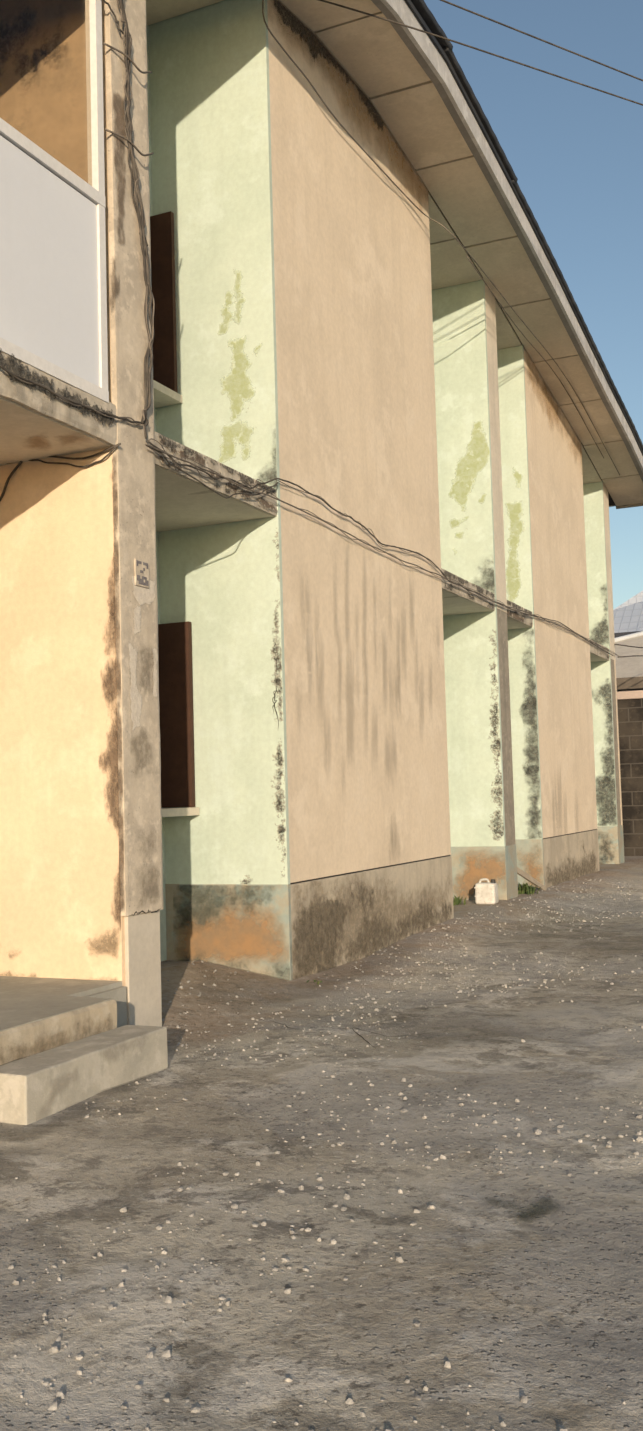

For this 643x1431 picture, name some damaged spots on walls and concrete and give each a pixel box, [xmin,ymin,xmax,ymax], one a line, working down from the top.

water stain [274,0,384,130]
water stain [0,349,118,426]
peeling [158,270,278,513]
peeling [448,421,490,555]
peeling [505,468,526,622]
peeling [270,601,283,722]
water stain [93,543,124,953]
peeling [271,742,286,877]
water stain [521,652,540,838]
water stain [547,684,617,886]
water stain [178,885,255,928]
water stain [278,890,451,979]